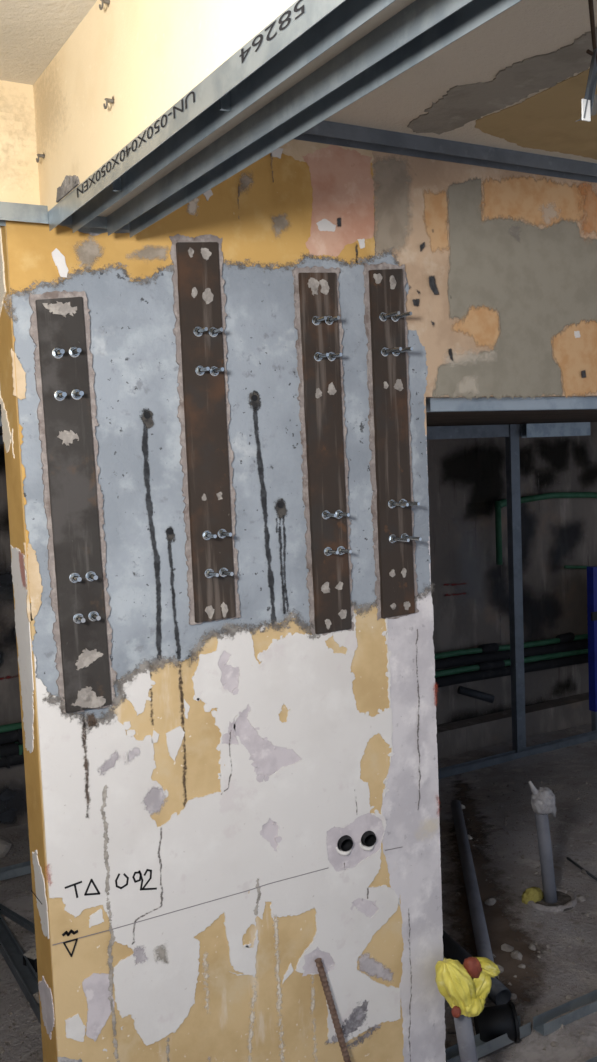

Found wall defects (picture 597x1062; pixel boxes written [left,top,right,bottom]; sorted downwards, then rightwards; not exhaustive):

peeling [407,27,597,160]
peeling [420,176,597,399]
damp [0,568,14,600]
damp [0,627,17,666]
damp [141,408,187,807]
spalling [0,139,446,1062]
damp [249,391,289,624]
damp [521,503,535,567]
damp [523,590,561,639]
damp [551,523,581,569]
crack [101,785,163,1062]